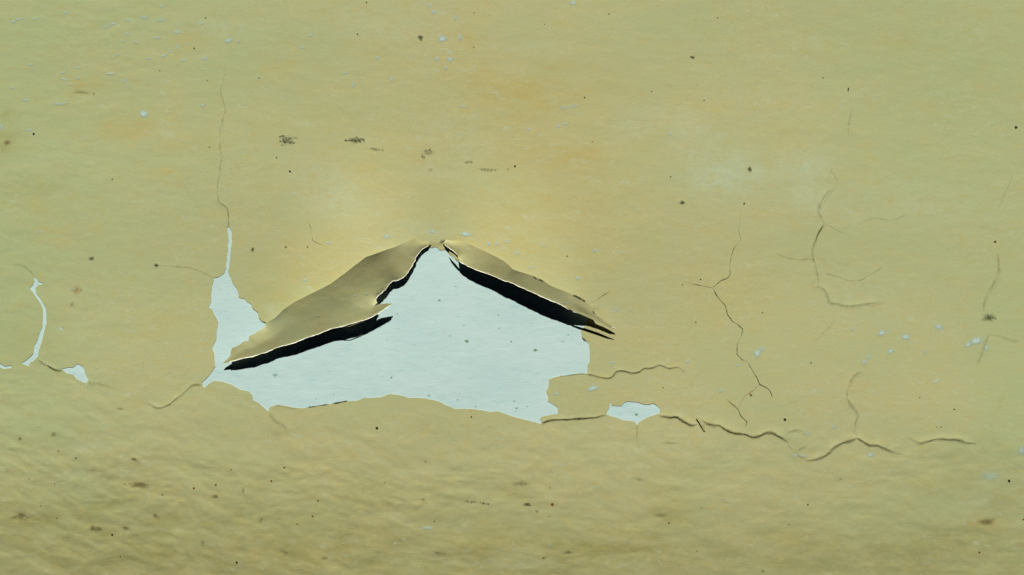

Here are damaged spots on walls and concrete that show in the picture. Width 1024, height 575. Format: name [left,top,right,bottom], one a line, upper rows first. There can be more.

peeling [0,277,46,369]
peeling [202,227,614,424]
peeling [62,364,88,383]
crack [587,360,687,379]
crack [540,410,606,425]
peeling [606,401,660,425]
crack [659,365,977,462]